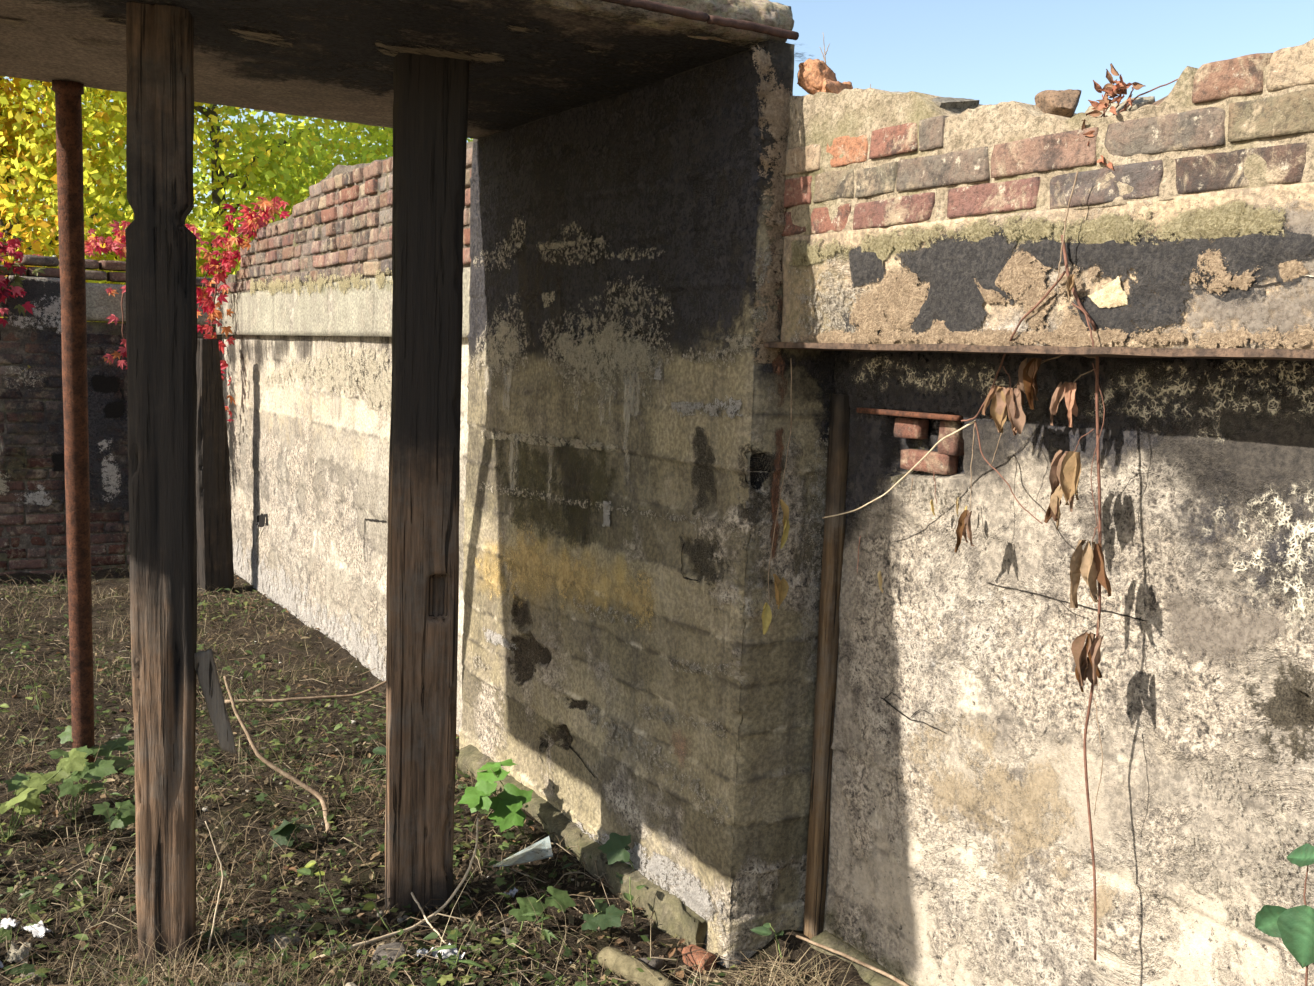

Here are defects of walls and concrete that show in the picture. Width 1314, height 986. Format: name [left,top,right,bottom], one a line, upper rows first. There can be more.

damp [5,366,47,390]
damp [469,215,752,425]
peeling [750,45,793,364]
peeling [799,200,1314,349]
damp [1179,501,1248,559]
damp [1291,575,1314,704]